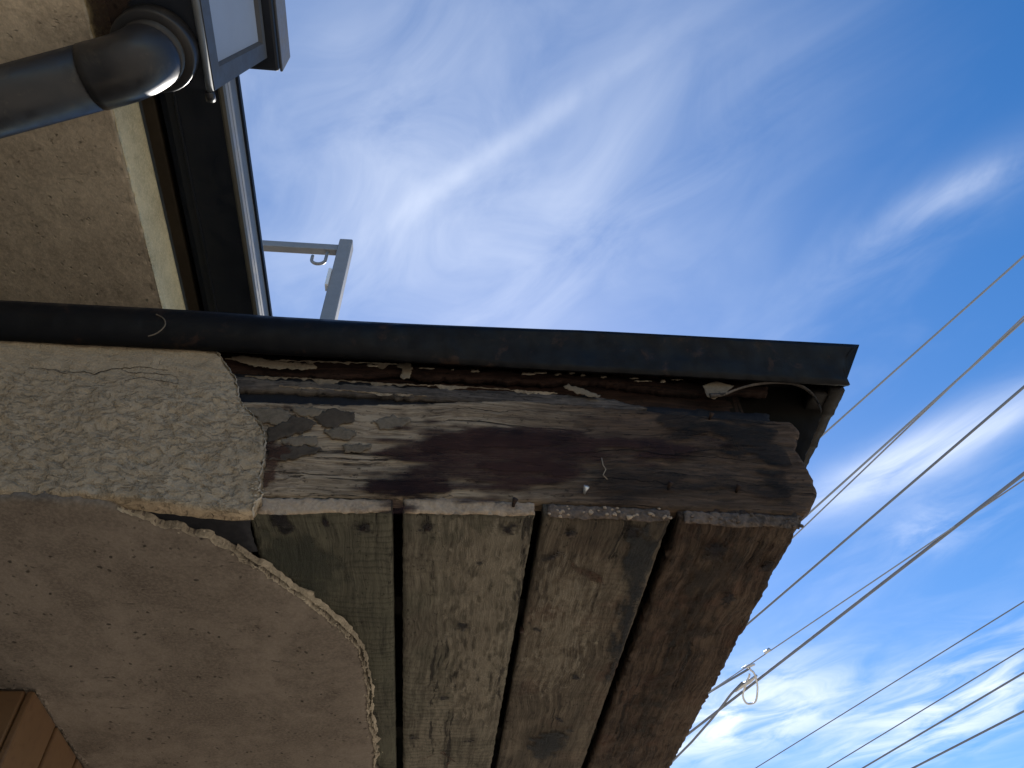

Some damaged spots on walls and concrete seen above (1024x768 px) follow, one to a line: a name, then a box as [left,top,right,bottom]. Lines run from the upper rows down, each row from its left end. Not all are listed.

crack [28,366,179,384]
peeling [216,352,600,517]
water stain [355,411,794,514]
peeling [702,381,822,414]
spalling [117,505,383,768]